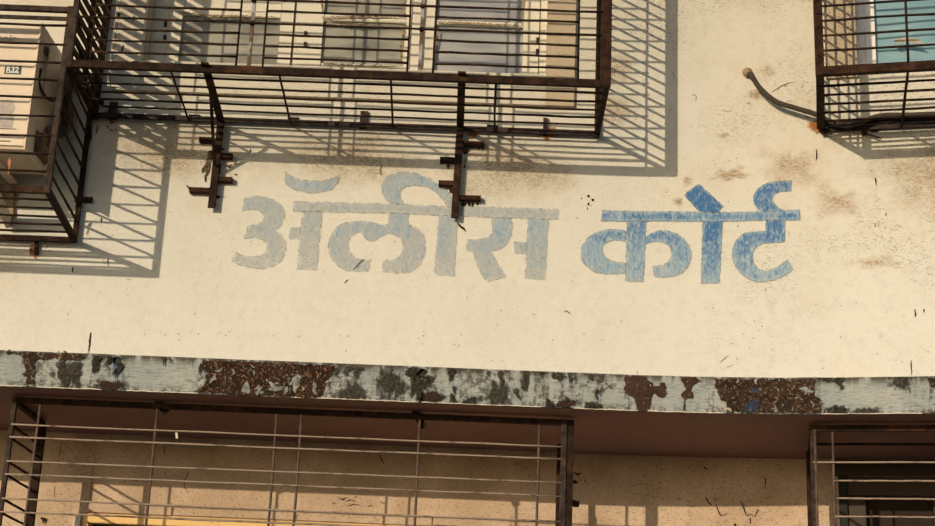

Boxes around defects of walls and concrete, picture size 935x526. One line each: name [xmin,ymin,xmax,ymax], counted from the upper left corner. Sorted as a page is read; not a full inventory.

peeling [6,349,88,385]
peeling [197,360,337,399]
peeling [623,375,667,411]
peeling [711,377,823,414]